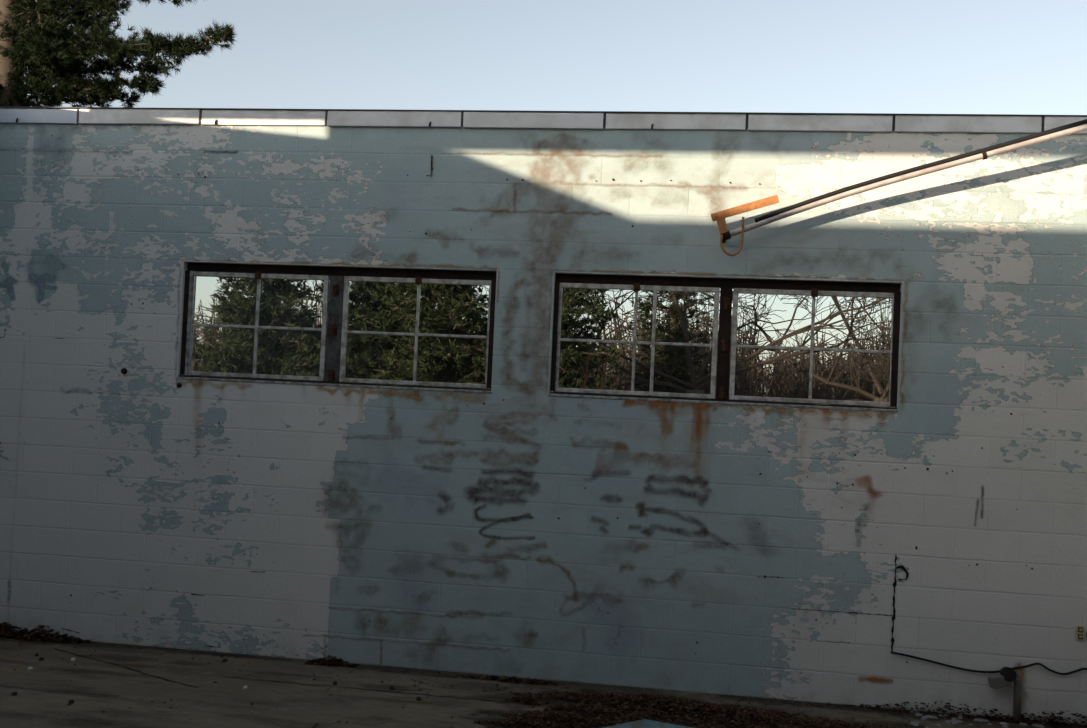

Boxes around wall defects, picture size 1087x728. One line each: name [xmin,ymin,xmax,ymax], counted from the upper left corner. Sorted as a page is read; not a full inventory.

peeling [0,124,430,565]
peeling [119,389,379,660]
corrosion [624,400,785,436]
peeling [714,132,1087,699]